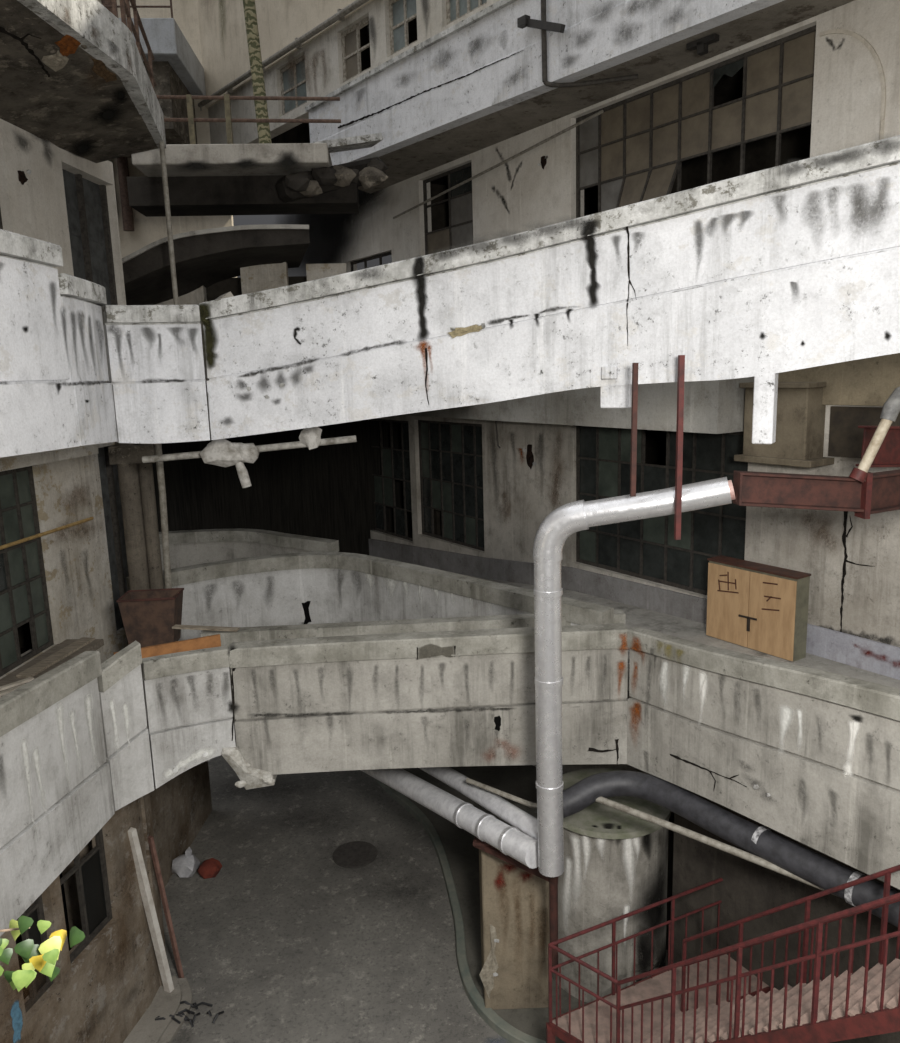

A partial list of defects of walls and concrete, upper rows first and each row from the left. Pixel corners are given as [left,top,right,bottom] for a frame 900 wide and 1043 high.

crack [0,27,50,77]
water stain [413,257,428,340]
water stain [535,220,599,306]
crack [626,226,637,344]
water stain [696,211,749,252]
water stain [172,305,216,368]
crack [840,511,872,632]
water stain [659,644,707,712]
water stain [781,707,802,740]
water stain [844,716,862,775]
water stain [563,823,651,915]